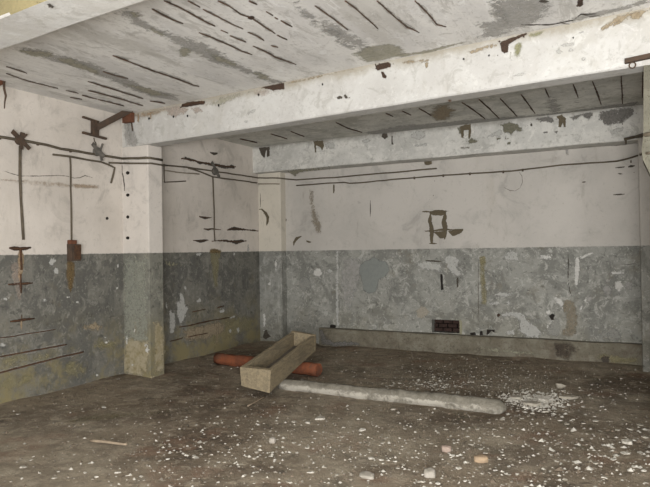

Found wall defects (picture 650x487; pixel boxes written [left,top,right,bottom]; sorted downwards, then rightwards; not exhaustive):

spalling [164,0,296,65]
spalling [497,33,527,56]
leakage [19,48,178,100]
spalling [113,55,199,87]
spalling [375,62,391,78]
spalling [66,81,143,106]
peeling [150,101,205,123]
peeling [479,76,637,144]
spalling [458,124,477,148]
spalling [423,210,463,244]
flaking render [124,285,235,378]